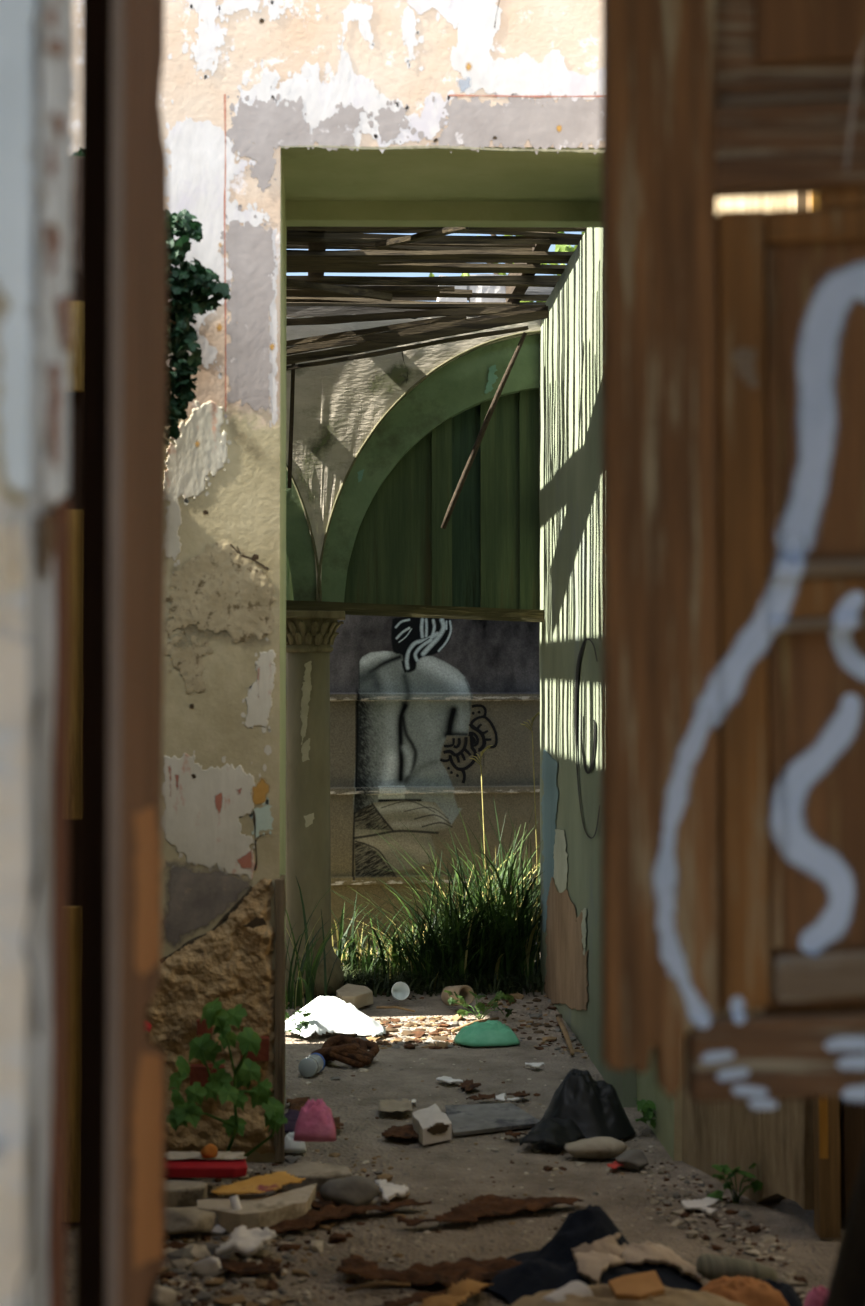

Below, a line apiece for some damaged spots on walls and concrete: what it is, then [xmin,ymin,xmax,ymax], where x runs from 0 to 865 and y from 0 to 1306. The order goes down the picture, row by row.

flaking render [147,0,602,1154]